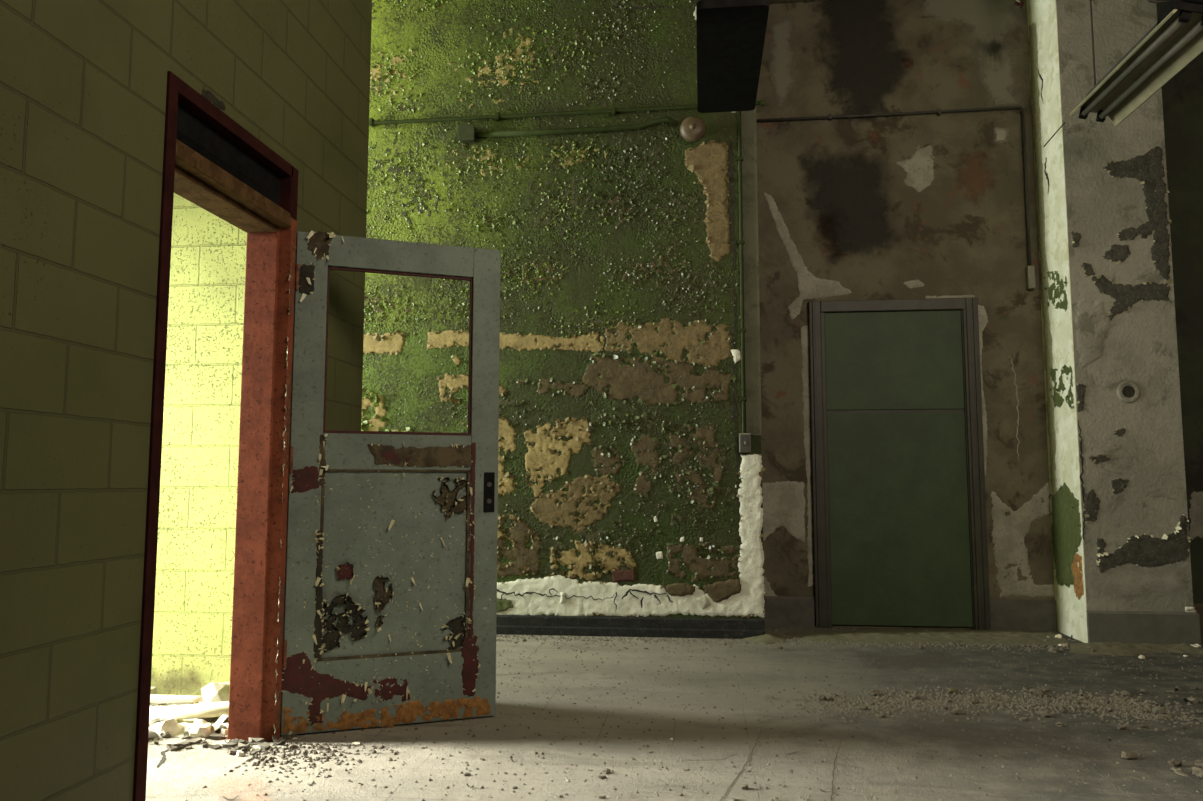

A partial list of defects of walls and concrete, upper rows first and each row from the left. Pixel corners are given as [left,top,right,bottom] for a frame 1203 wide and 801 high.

flaking render [275,0,852,727]
flaking render [897,145,935,192]
flaking render [903,280,988,476]
flaking render [991,23,1100,598]
flaking render [1088,454,1110,464]
flaking render [1111,478,1129,494]
flaking render [1081,146,1172,322]